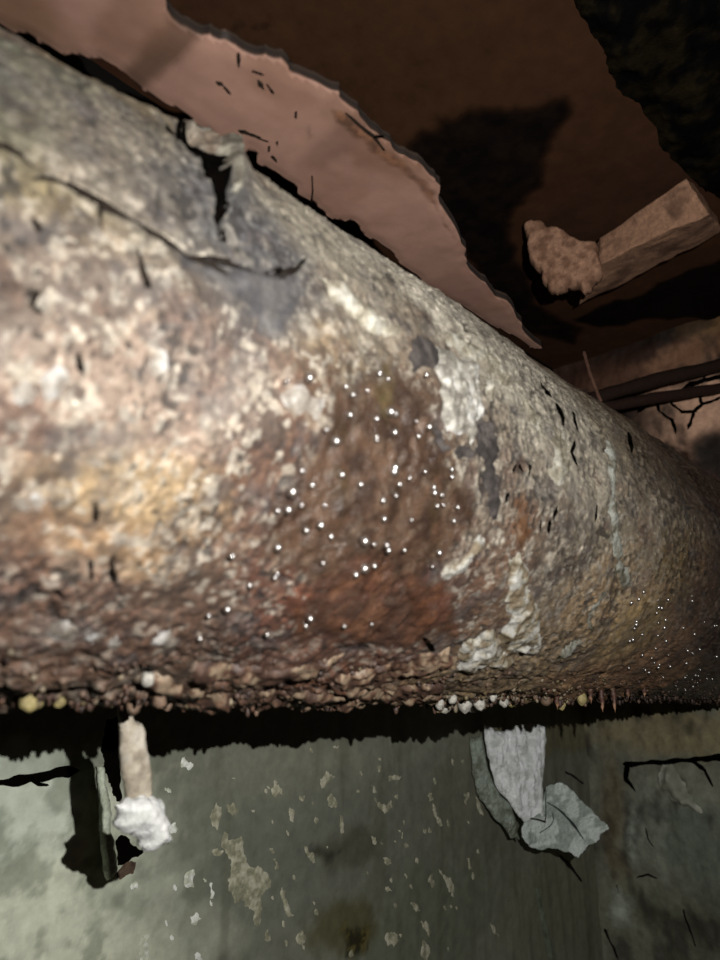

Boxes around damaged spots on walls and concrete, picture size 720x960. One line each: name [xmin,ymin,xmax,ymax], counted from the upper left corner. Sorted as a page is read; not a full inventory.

crack [0,115,307,279]
water stain [314,269,402,337]
water stain [275,332,513,582]
water stain [521,393,572,486]
corrosion [292,558,456,644]
efflorescence [457,552,542,674]
peeling [320,771,344,834]
crack [623,753,720,791]
peeling [210,803,294,941]
peeling [385,932,402,947]
peeling [410,902,431,960]
peeling [428,870,458,910]